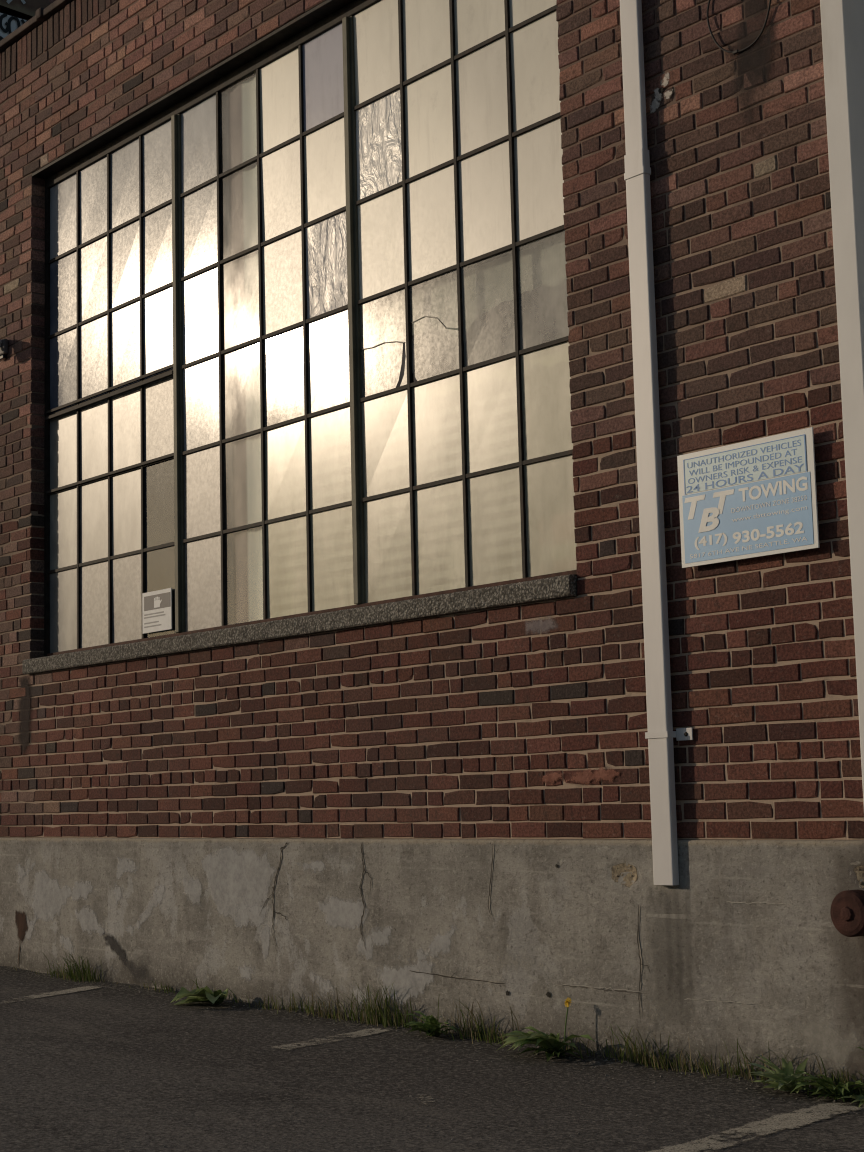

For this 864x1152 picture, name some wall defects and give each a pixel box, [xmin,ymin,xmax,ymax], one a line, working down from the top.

peeling [650,73,672,112]
crack [261,843,288,946]
crack [359,842,372,949]
rust [15,911,28,962]
leakage [102,933,146,978]
crack [410,970,505,984]